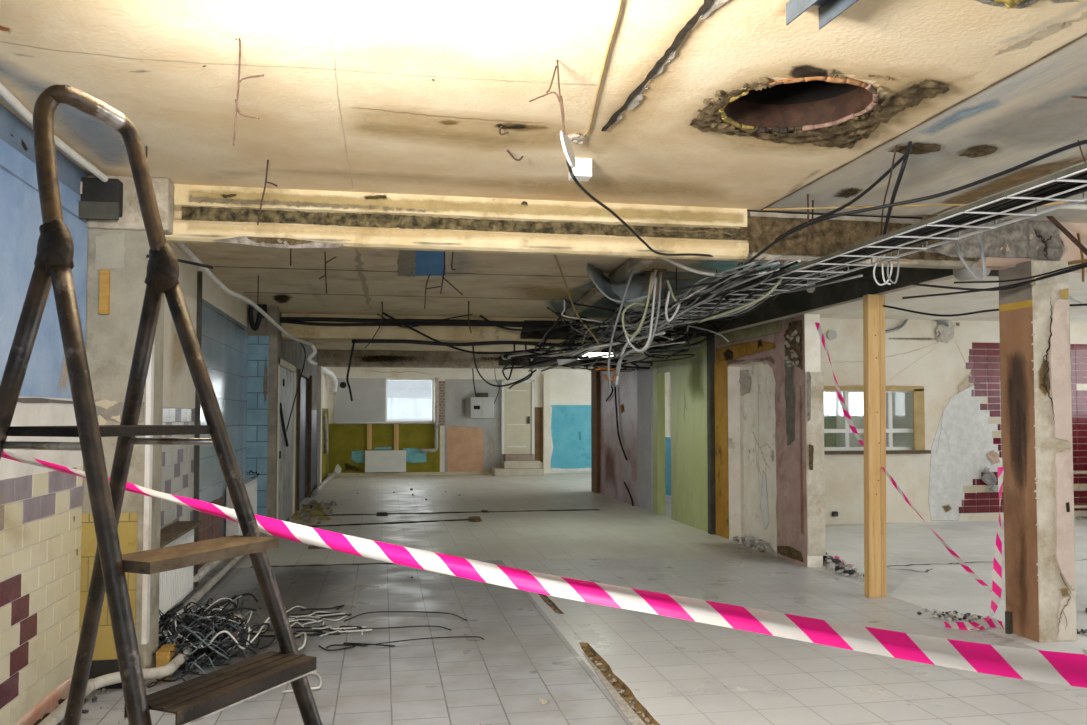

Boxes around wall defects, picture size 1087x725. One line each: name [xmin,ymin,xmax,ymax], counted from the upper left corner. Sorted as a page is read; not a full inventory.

spalling [976,0,1039,9]
spalling [690,80,949,149]
spalling [739,210,938,256]
spalling [882,216,1087,261]
flaking render [929,381,1003,521]